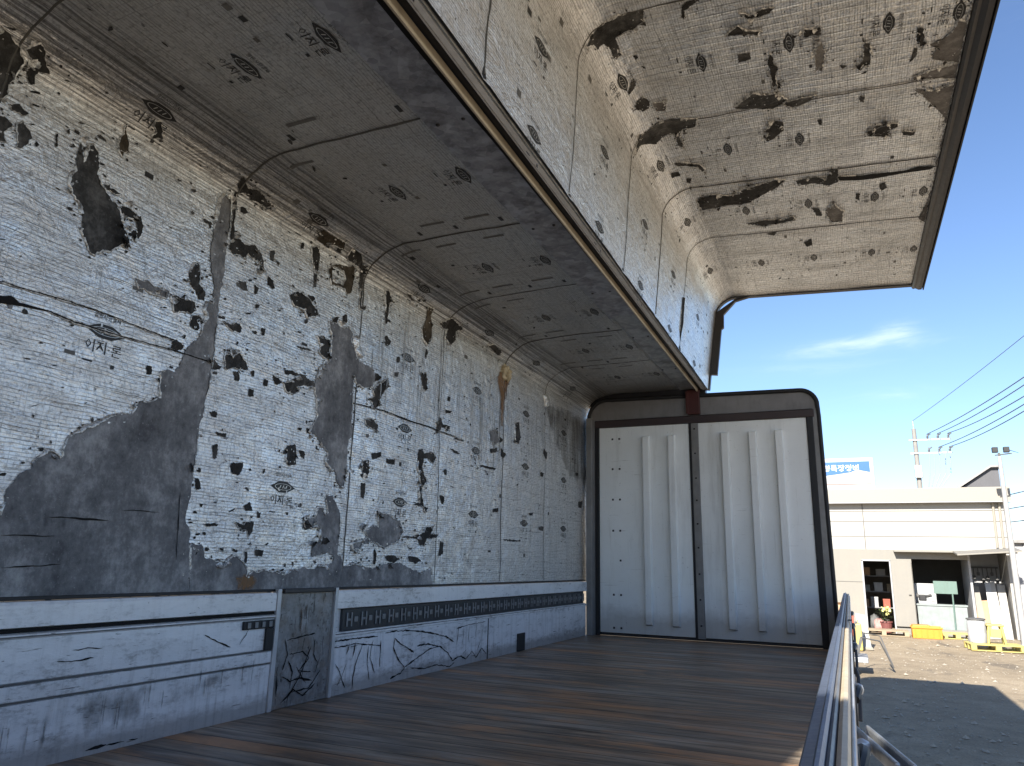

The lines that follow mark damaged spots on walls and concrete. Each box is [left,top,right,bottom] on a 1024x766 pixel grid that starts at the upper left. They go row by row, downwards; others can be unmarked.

peeling [586,9,646,65]
peeling [0,26,63,149]
peeling [112,120,164,162]
peeling [628,81,711,183]
peeling [733,52,817,142]
peeling [908,0,974,223]
peeling [55,128,149,264]
peeling [696,167,844,215]
peeling [0,173,451,602]
corrosion [498,364,512,426]
crack [335,621,485,687]